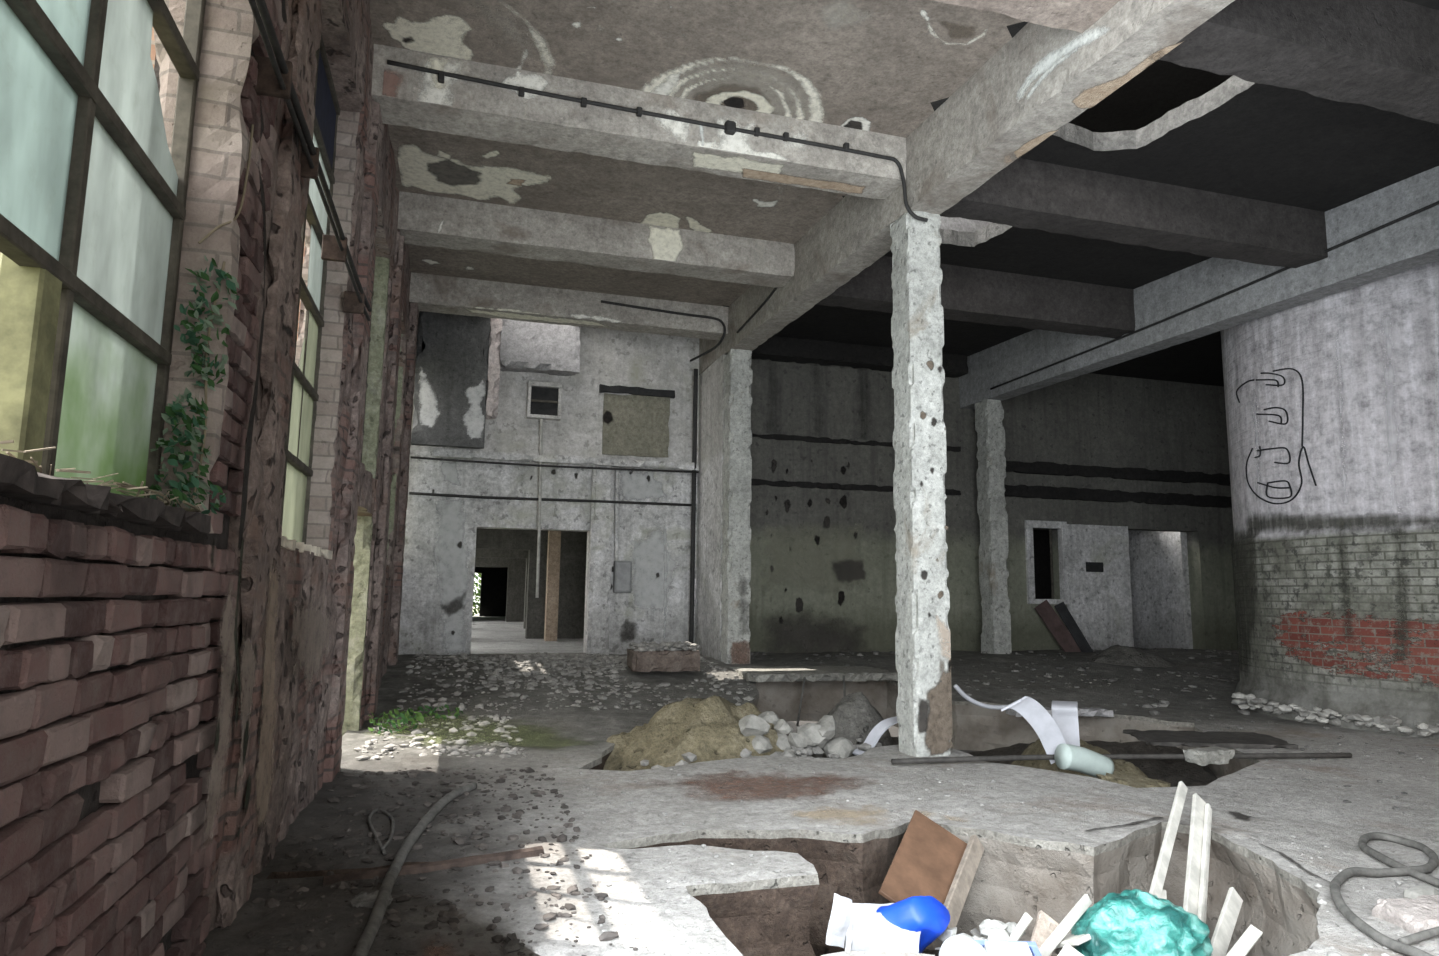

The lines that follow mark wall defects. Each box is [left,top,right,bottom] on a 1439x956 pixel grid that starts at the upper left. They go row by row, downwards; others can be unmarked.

peeling [398,144,549,204]
spalling [693,141,865,194]
peeling [753,199,777,207]
peeling [641,212,711,261]
peeling [419,370,440,427]
peeling [463,381,485,439]
water stain [1231,470,1439,672]